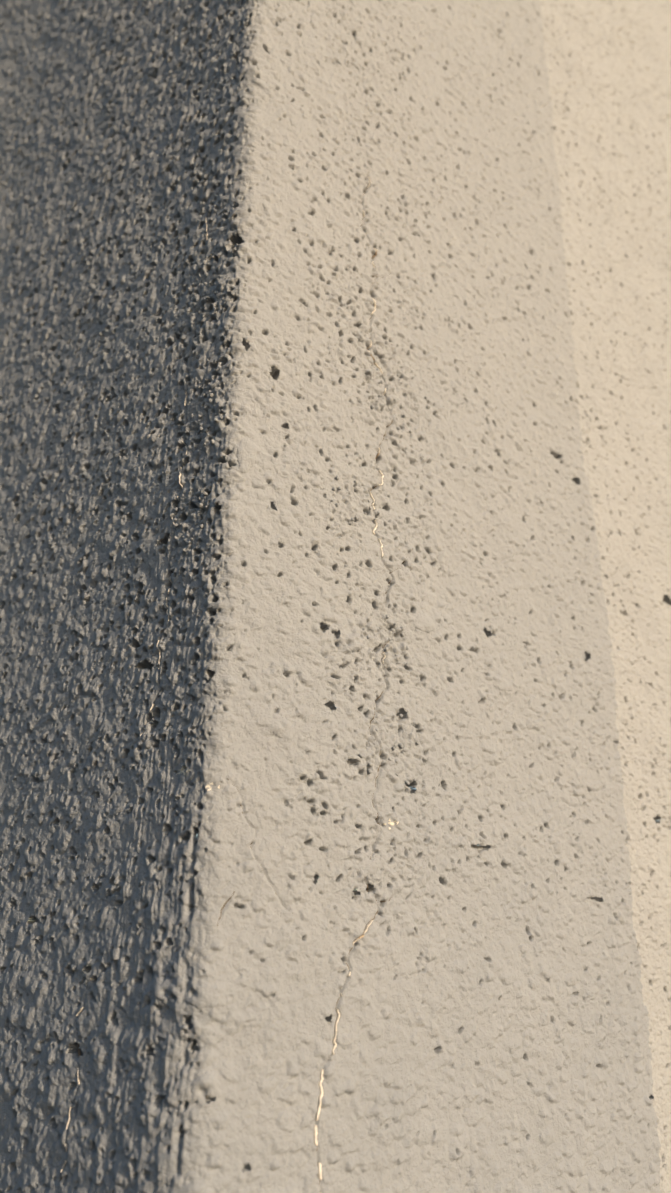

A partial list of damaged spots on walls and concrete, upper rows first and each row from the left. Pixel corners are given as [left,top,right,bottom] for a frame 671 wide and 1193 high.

crack [361,172,405,664]
crack [314,692,390,1192]